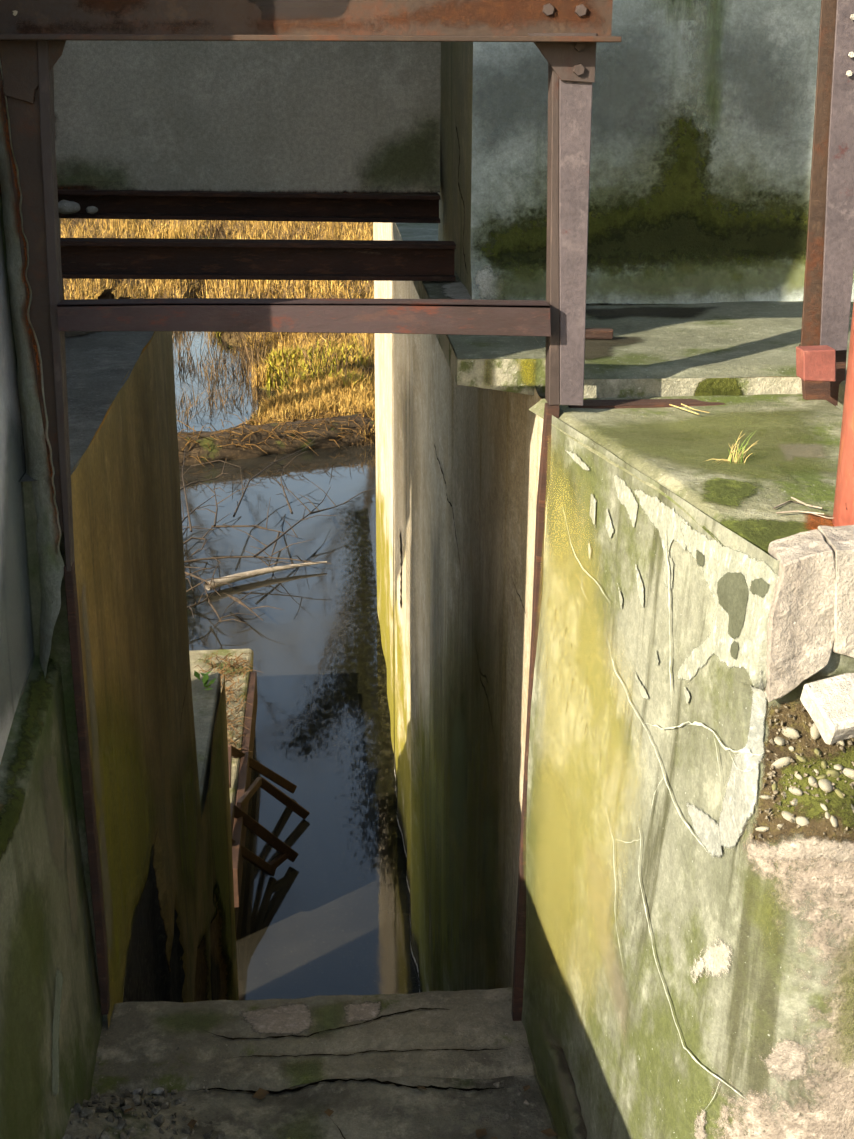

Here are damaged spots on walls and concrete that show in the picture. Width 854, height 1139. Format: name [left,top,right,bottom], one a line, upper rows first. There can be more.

rust [384,0,596,27]
leakage [476,58,548,144]
leakage [591,44,658,136]
rust [0,86,41,390]
leakage [497,270,546,300]
leakage [586,261,805,318]
crack [563,510,610,603]
crack [606,533,763,1112]
efflorescence [689,939,732,983]
crack [196,1008,507,1094]
efflorescence [765,1040,807,1082]
efflorescence [694,1110,706,1139]